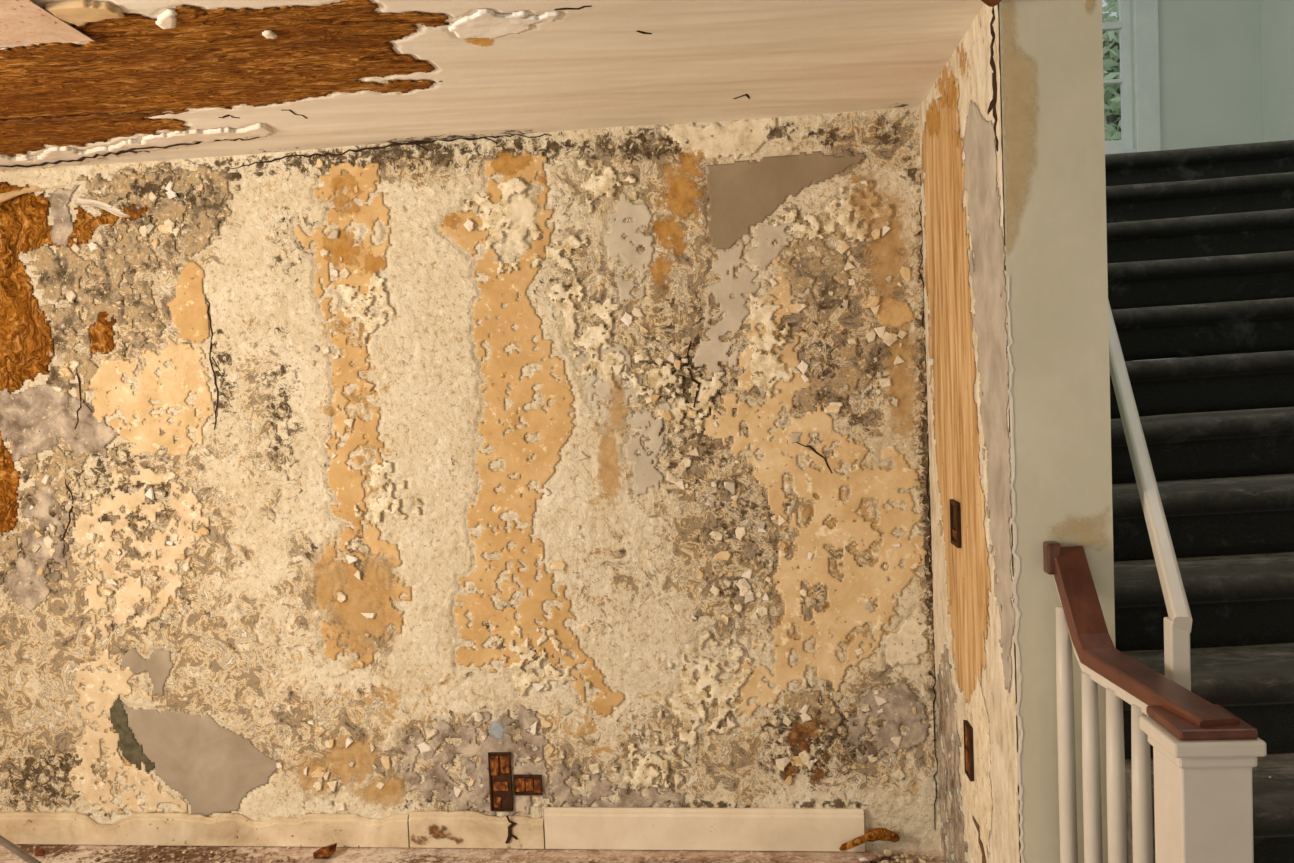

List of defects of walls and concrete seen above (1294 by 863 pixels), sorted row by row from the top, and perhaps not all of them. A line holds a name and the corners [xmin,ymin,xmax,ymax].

damp [583,139,630,159]
damp [767,122,853,146]
damp [875,103,917,181]
spalling [0,0,560,820]
peeling [401,149,686,816]
peeling [662,78,1025,863]
crack [918,173,938,825]
damp [665,800,751,808]
damp [793,798,866,808]
crack [972,815,986,863]